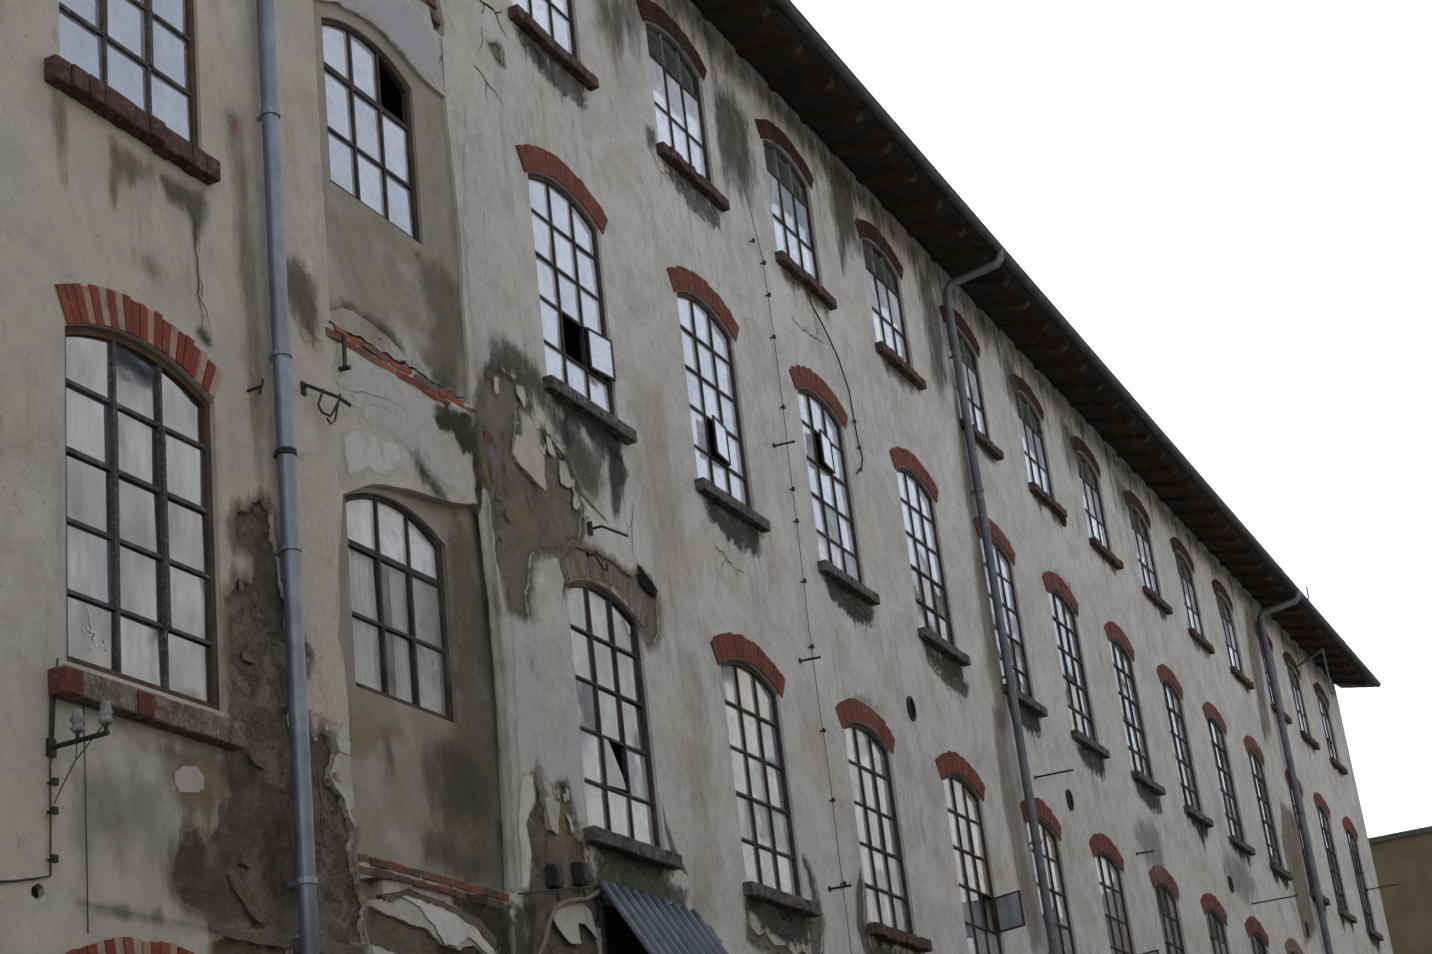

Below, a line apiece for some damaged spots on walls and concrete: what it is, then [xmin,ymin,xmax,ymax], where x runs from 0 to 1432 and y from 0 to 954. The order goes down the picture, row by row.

crack [439,0,569,151]
leakage [111,142,142,200]
leakage [161,174,206,239]
crack [192,212,211,329]
leakage [664,0,1334,740]
spalling [290,304,660,648]
spalling [167,492,300,954]
spalling [305,637,314,680]
spalling [308,706,604,954]
spalling [745,855,824,954]